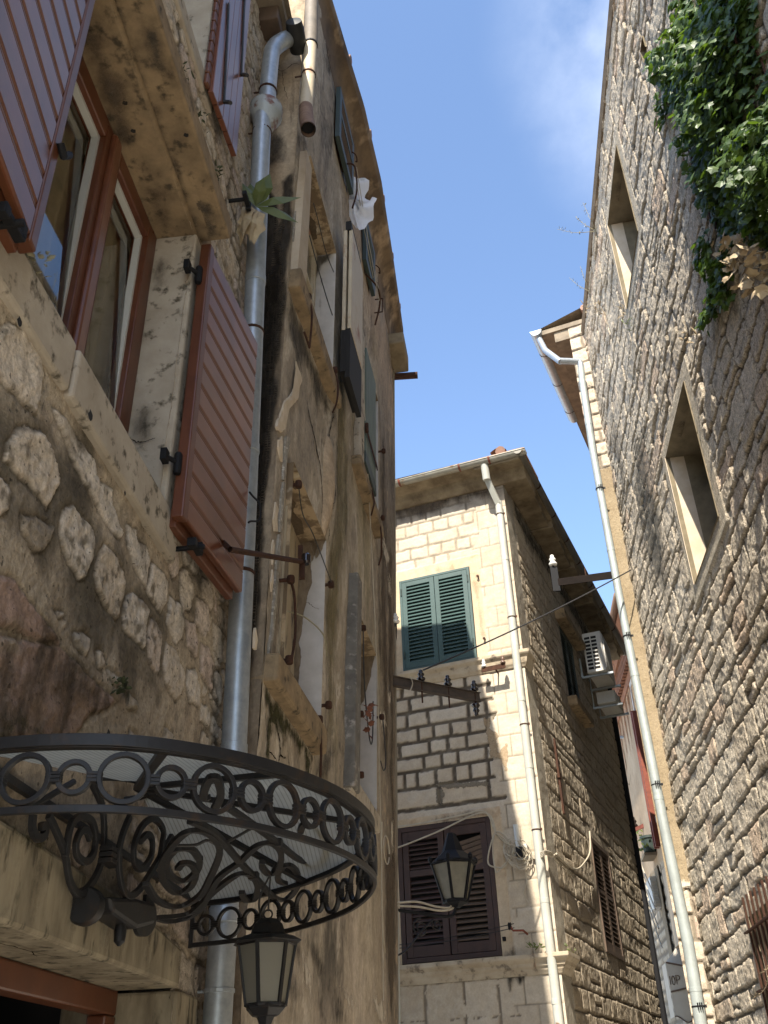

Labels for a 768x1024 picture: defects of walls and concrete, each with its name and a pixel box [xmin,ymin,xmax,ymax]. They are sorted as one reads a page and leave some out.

leakage [250,174,347,671]